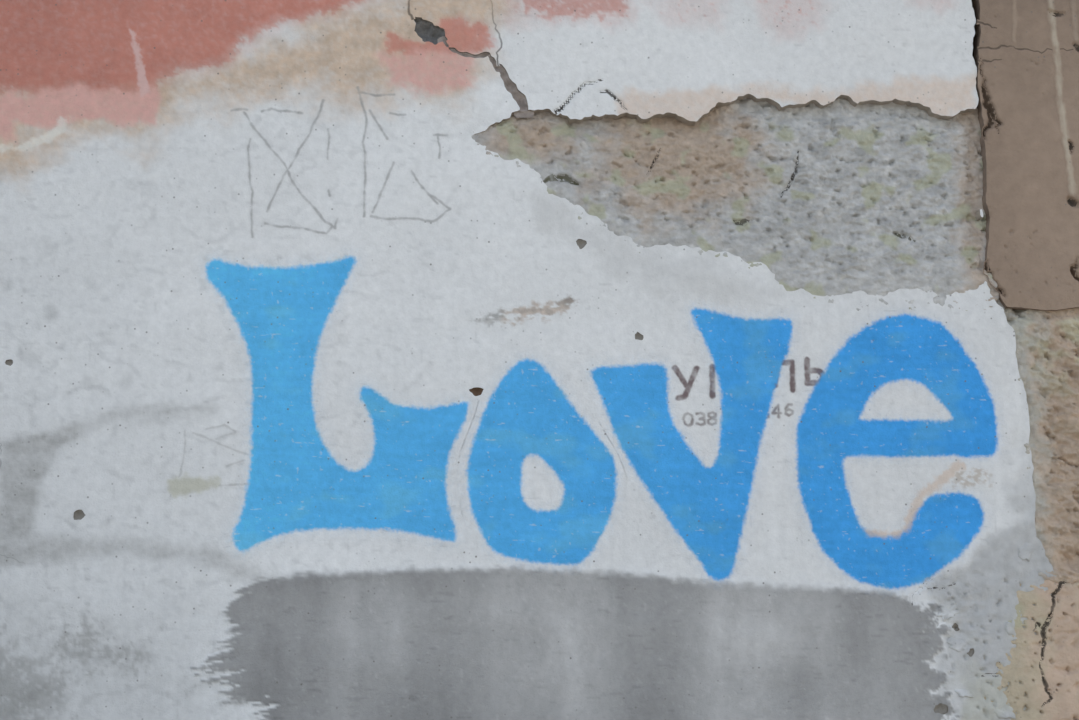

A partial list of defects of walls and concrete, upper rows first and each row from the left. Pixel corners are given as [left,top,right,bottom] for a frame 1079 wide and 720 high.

crack [407,0,628,118]
crack [1069,261,1079,282]
spalling [461,98,1079,584]
crack [1032,580,1069,707]
spalling [934,703,948,714]